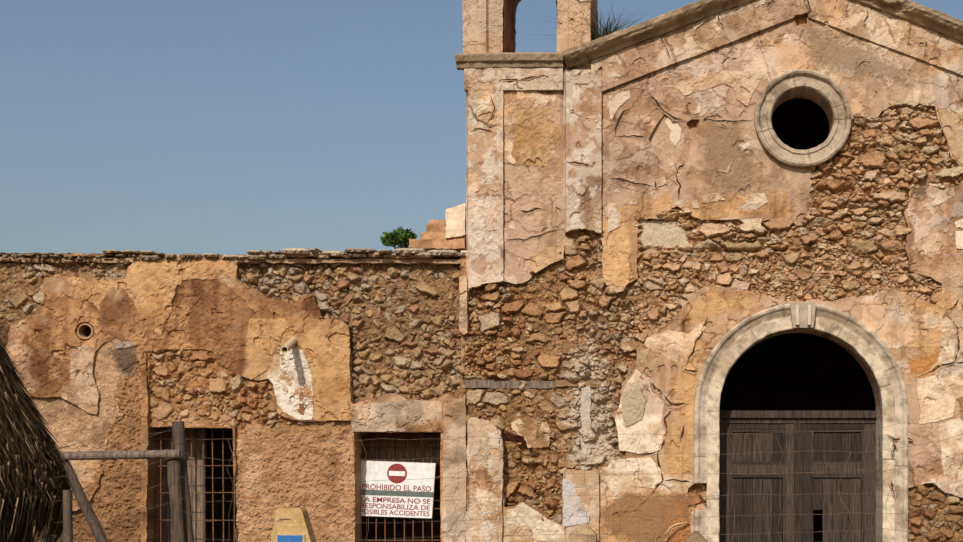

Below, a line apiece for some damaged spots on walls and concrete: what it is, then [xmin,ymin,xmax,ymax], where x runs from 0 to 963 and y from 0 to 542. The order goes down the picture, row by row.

crack [469,69,647,139]
flaking render [608,90,631,120]
crack [649,92,751,129]
crack [566,159,684,199]
flaking render [0,257,238,348]
spalling [145,98,963,542]
spalling [31,337,142,451]
spalling [73,509,97,542]
spalling [89,459,157,542]